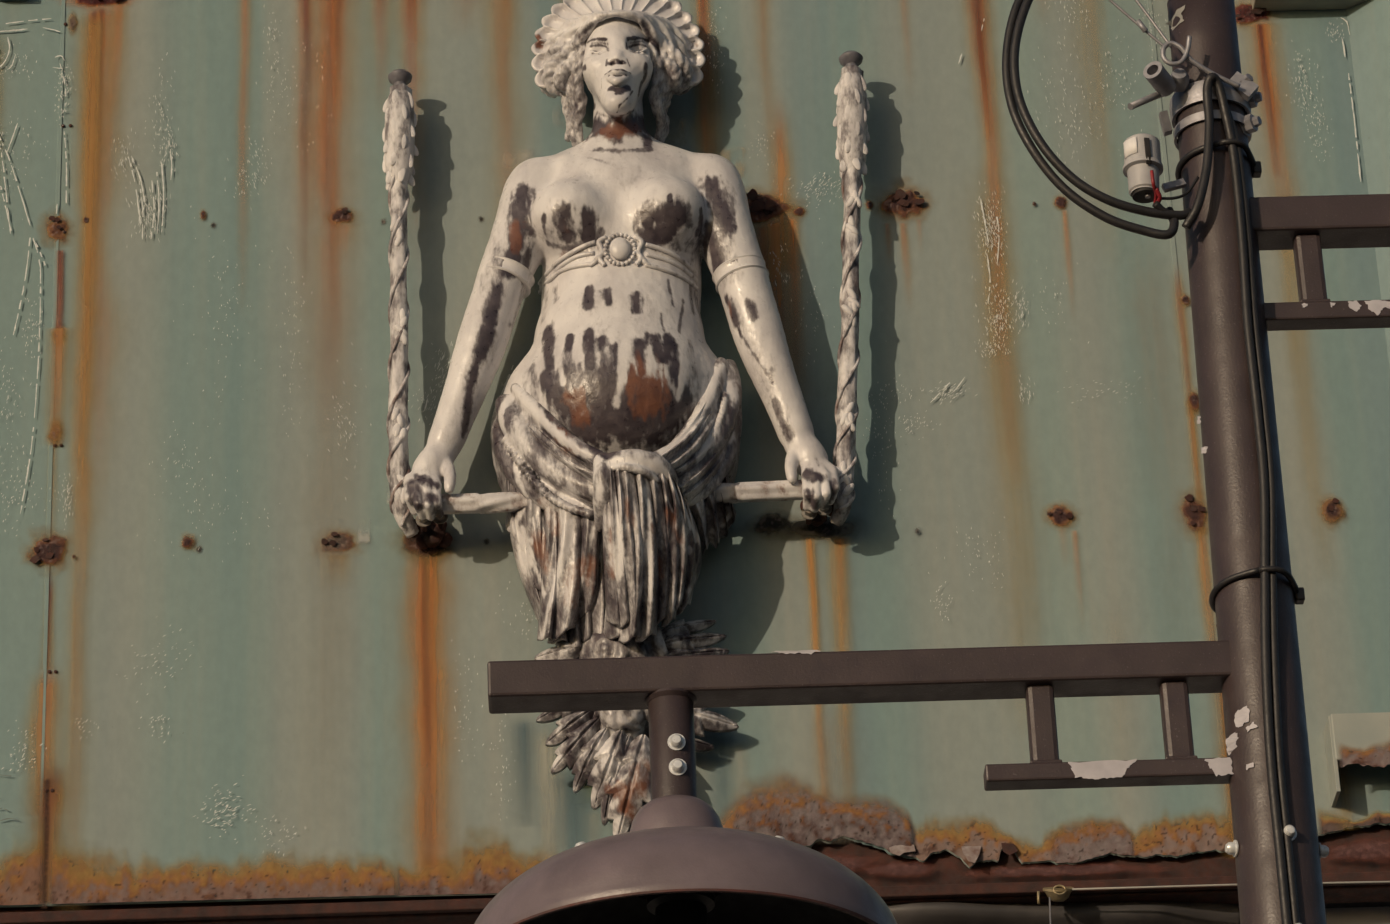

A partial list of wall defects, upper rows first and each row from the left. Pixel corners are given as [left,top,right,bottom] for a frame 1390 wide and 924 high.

corrosion [972,0,1002,240]
corrosion [46,0,127,497]
corrosion [328,207,353,224]
corrosion [746,140,805,322]
corrosion [866,189,926,219]
corrosion [1047,504,1074,526]
corrosion [1180,392,1210,619]
corrosion [1321,498,1346,523]
corrosion [0,529,552,907]
corrosion [722,780,1234,876]
corrosion [1319,812,1390,860]